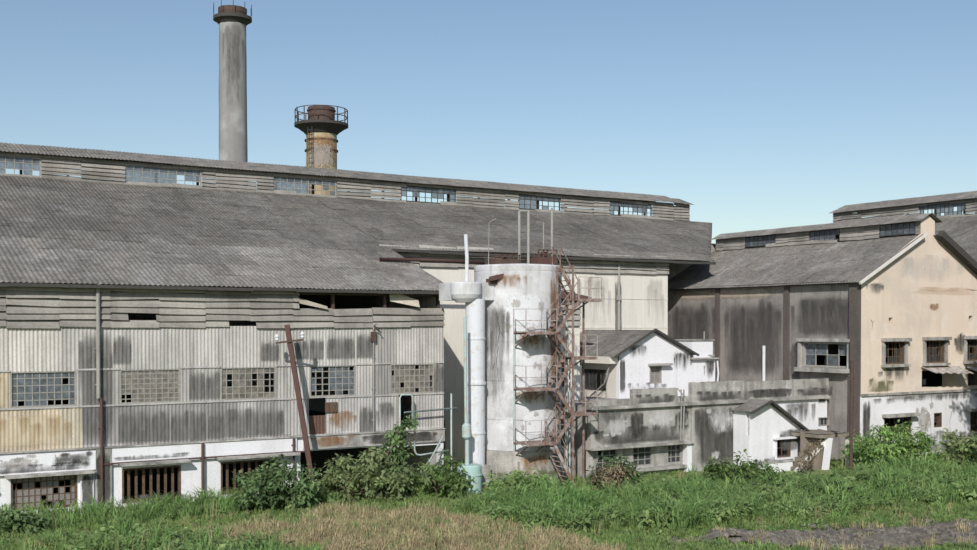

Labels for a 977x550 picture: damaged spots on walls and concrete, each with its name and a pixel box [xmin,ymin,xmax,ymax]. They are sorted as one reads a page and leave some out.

leakage [79,336,284,442]
leakage [295,336,373,359]
leakage [487,309,509,350]
corrosion [522,282,560,375]
leakage [620,360,631,391]
leakage [673,289,848,371]
leakage [790,346,799,377]
leakage [870,367,908,386]
leakage [595,382,832,467]
leakage [863,393,977,437]
leakage [0,451,187,505]